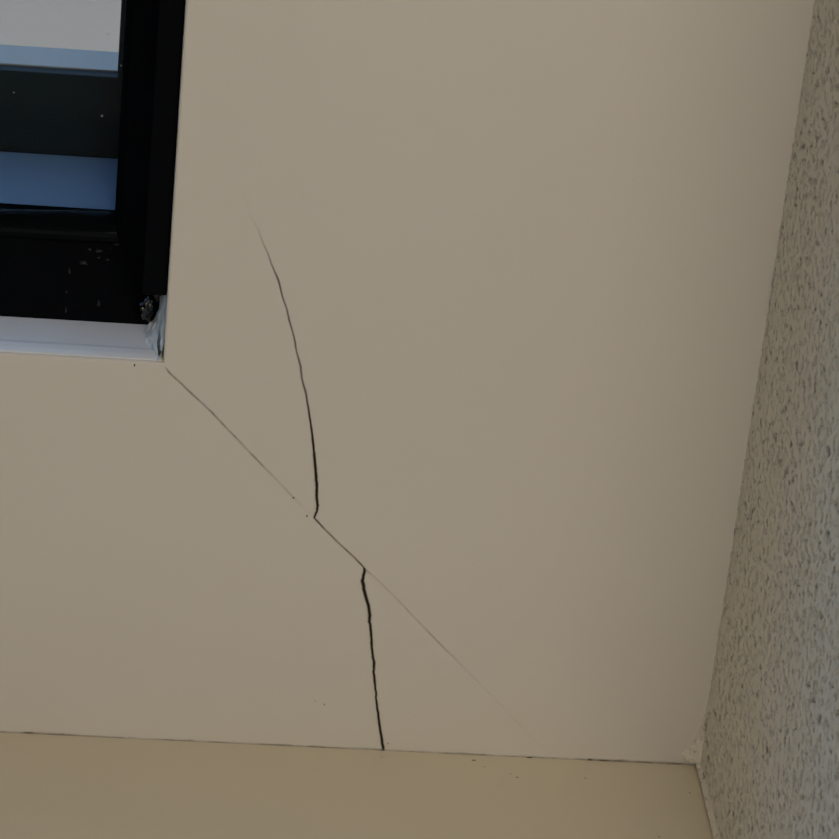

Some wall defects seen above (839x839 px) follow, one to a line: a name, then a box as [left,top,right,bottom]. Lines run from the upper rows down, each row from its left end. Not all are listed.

crack [288,316,384,751]